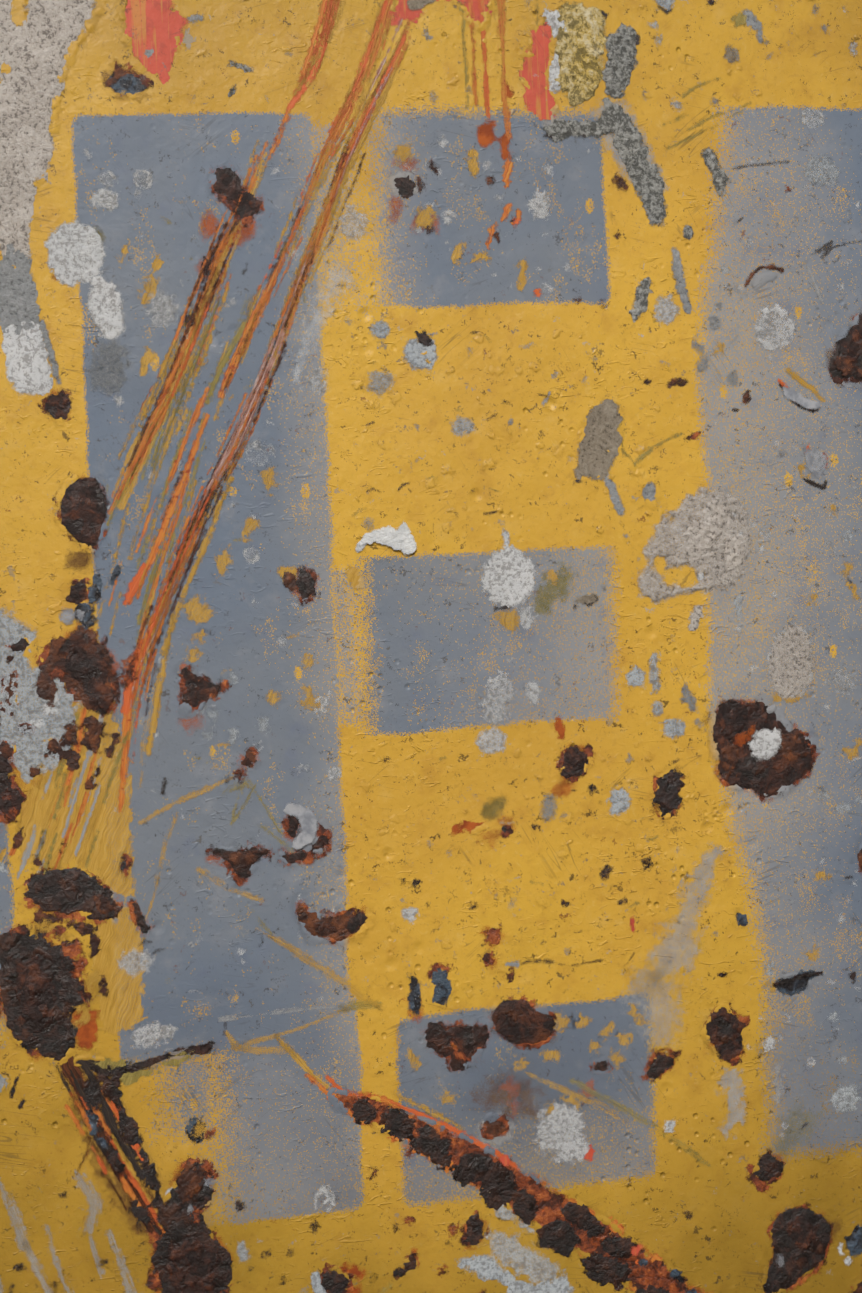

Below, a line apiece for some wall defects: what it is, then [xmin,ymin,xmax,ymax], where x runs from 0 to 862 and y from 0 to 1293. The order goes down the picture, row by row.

peeling [0,0,205,399]
corrosion [821,310,862,389]
peeling [641,479,663,511]
peeling [0,606,120,814]
corrosion [700,691,822,804]
corrosion [0,473,240,1293]
corrosion [204,803,334,887]
corrosion [418,922,558,1078]
corrosion [699,1000,751,1071]
corrosion [325,1084,720,1293]
peeling [454,1226,575,1293]
corrosion [757,1201,843,1293]